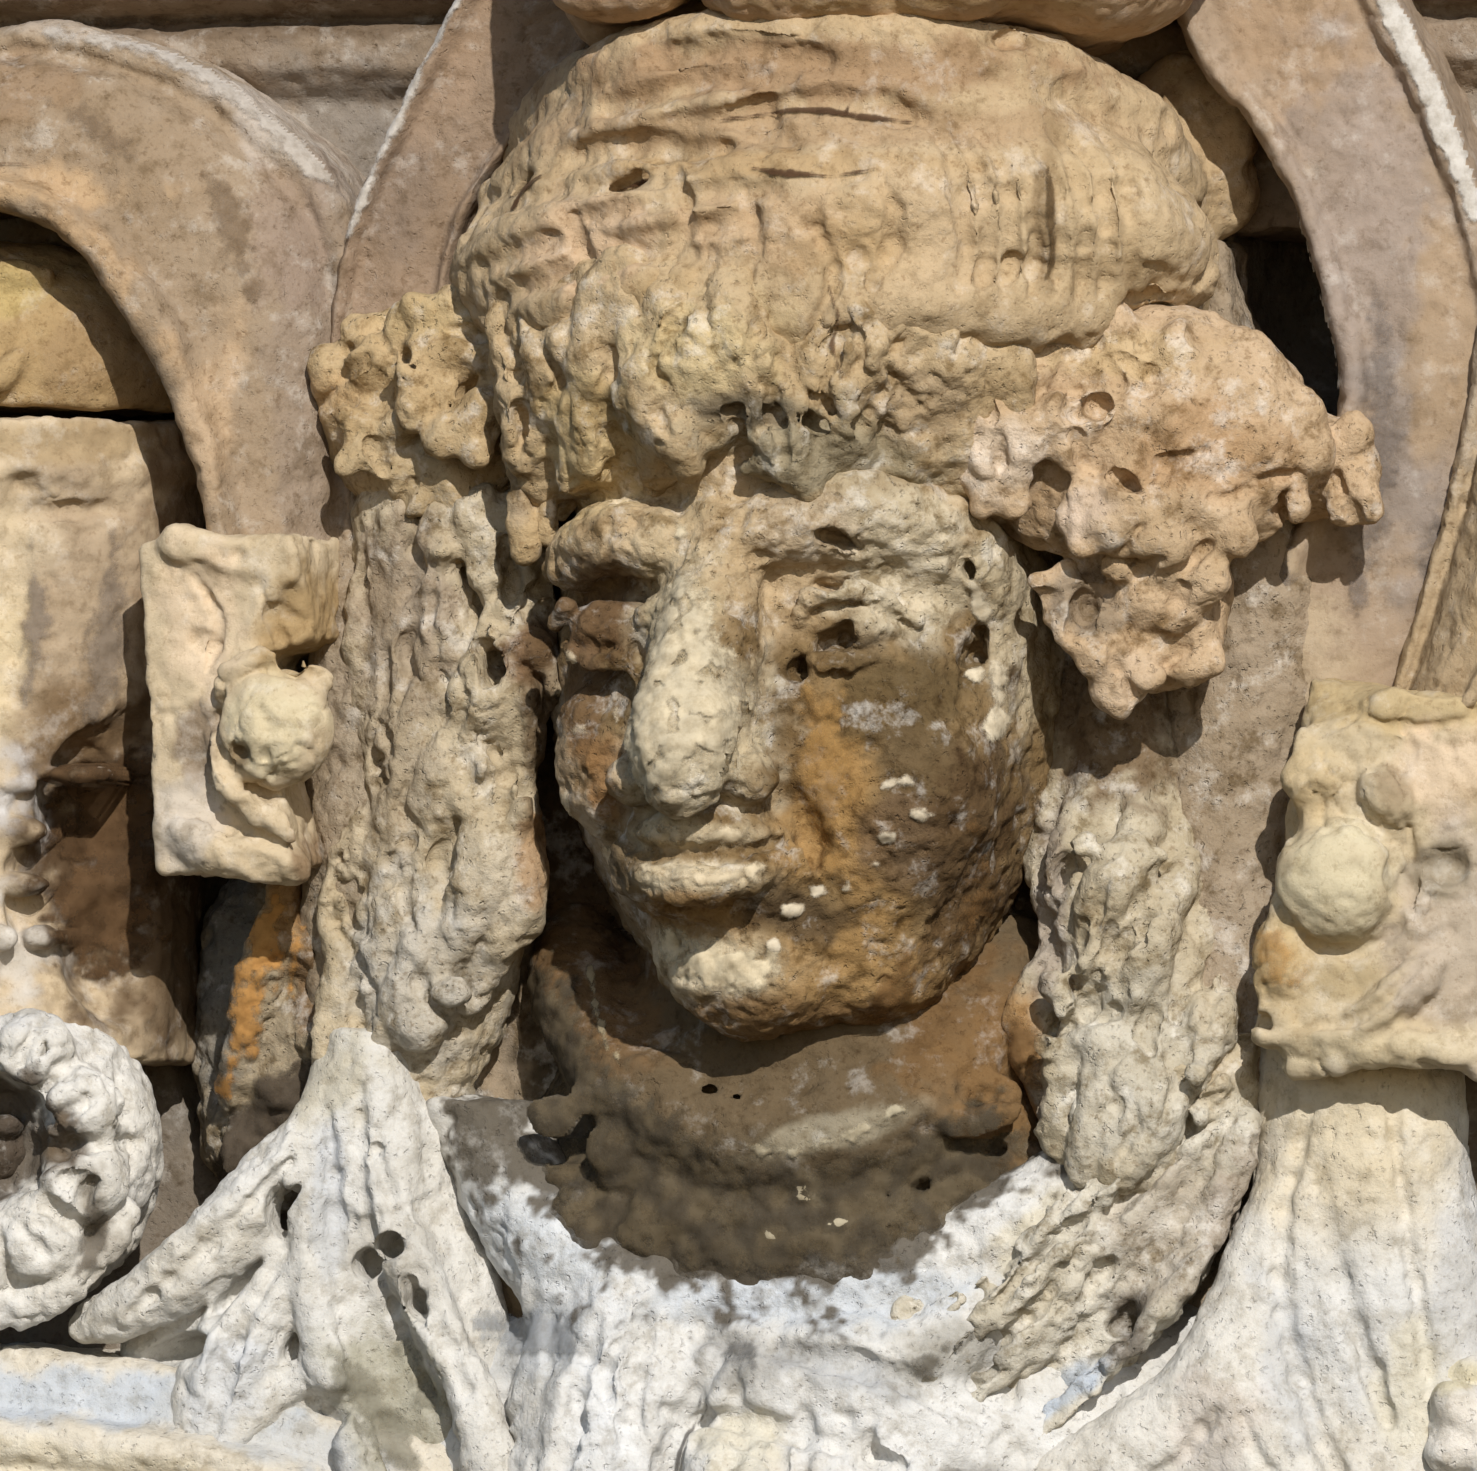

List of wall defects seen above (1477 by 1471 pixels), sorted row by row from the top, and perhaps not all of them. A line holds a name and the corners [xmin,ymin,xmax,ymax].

rust [806,689,856,868]
rust [214,893,301,1099]
rust [862,951,914,1025]
leakage [526,964,1035,1280]